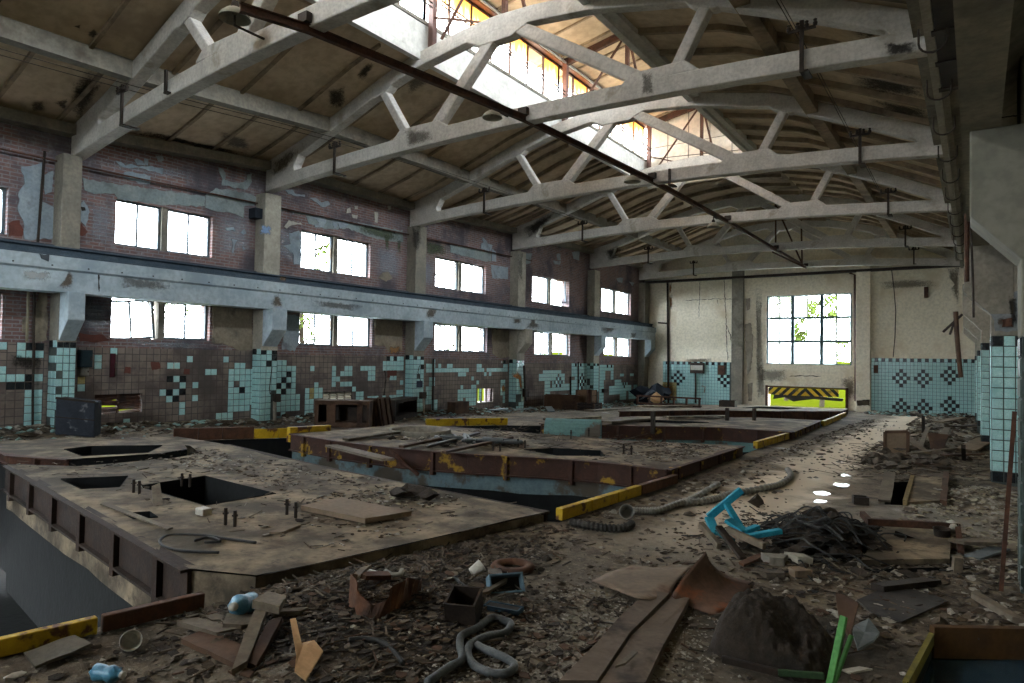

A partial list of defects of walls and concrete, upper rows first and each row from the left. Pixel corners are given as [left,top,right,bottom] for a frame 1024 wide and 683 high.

leakage [888,43,914,55]
leakage [57,76,98,117]
leakage [330,88,345,107]
flaking render [8,163,54,240]
flaking render [80,156,256,253]
flaking render [281,190,403,265]
peeling [0,293,49,427]
peeling [423,329,509,410]